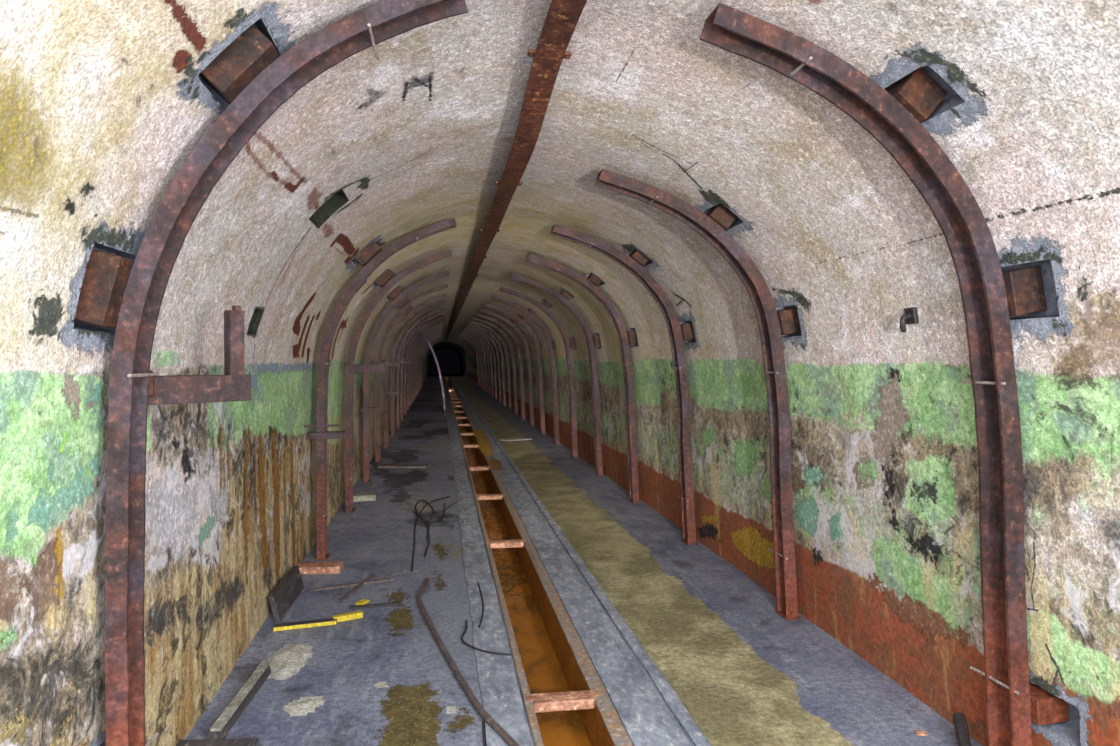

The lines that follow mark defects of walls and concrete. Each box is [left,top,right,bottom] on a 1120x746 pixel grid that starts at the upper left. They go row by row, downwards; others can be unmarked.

corrosion [165,0,207,73]
spalling [175,1,299,124]
spalling [868,42,992,138]
spalling [28,214,148,359]
crack [818,233,943,264]
spalling [997,232,1093,344]
crack [985,187,1120,222]
peeling [0,431,99,628]
corrosion [213,426,230,489]
corrosion [243,426,296,612]
leakage [881,454,948,570]
spalling [1029,670,1094,746]